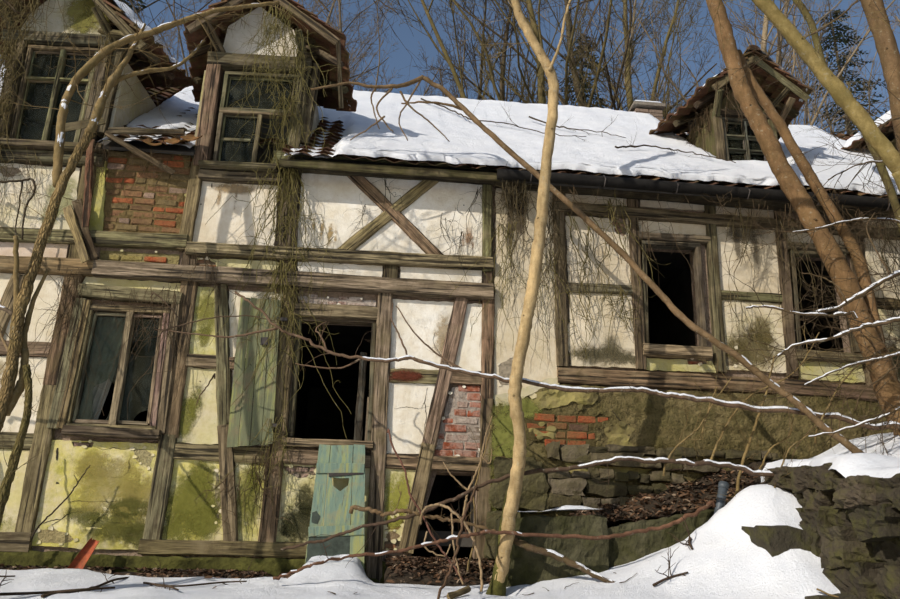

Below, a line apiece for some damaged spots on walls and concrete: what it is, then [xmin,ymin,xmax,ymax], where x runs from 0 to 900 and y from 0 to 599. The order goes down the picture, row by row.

spalling [103,134,192,234]
water stain [575,336,636,365]
water stain [726,318,779,368]
water stain [189,388,201,417]
spalling [434,385,481,457]
flaking render [493,356,512,406]
spalling [521,377,635,447]
water stain [66,507,99,522]
water stain [113,499,147,548]
water stain [164,462,221,540]